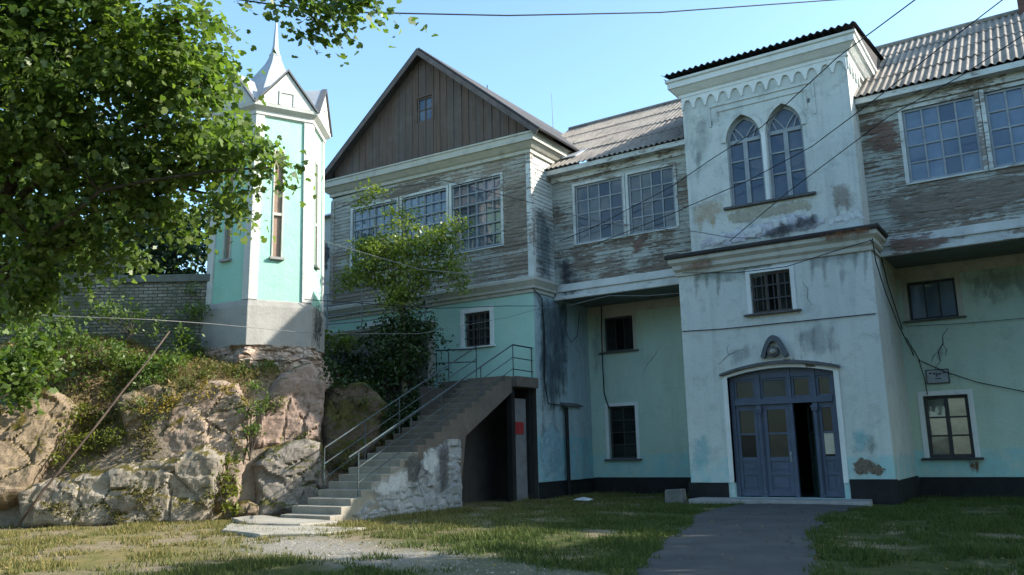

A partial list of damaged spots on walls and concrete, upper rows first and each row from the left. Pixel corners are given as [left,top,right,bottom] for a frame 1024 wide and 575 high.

peeling [861,118,901,155]
peeling [382,177,441,200]
peeling [503,179,527,247]
peeling [571,235,671,279]
water stain [766,215,816,237]
peeling [889,232,948,255]
peeling [372,447,449,495]
spalling [853,457,886,476]